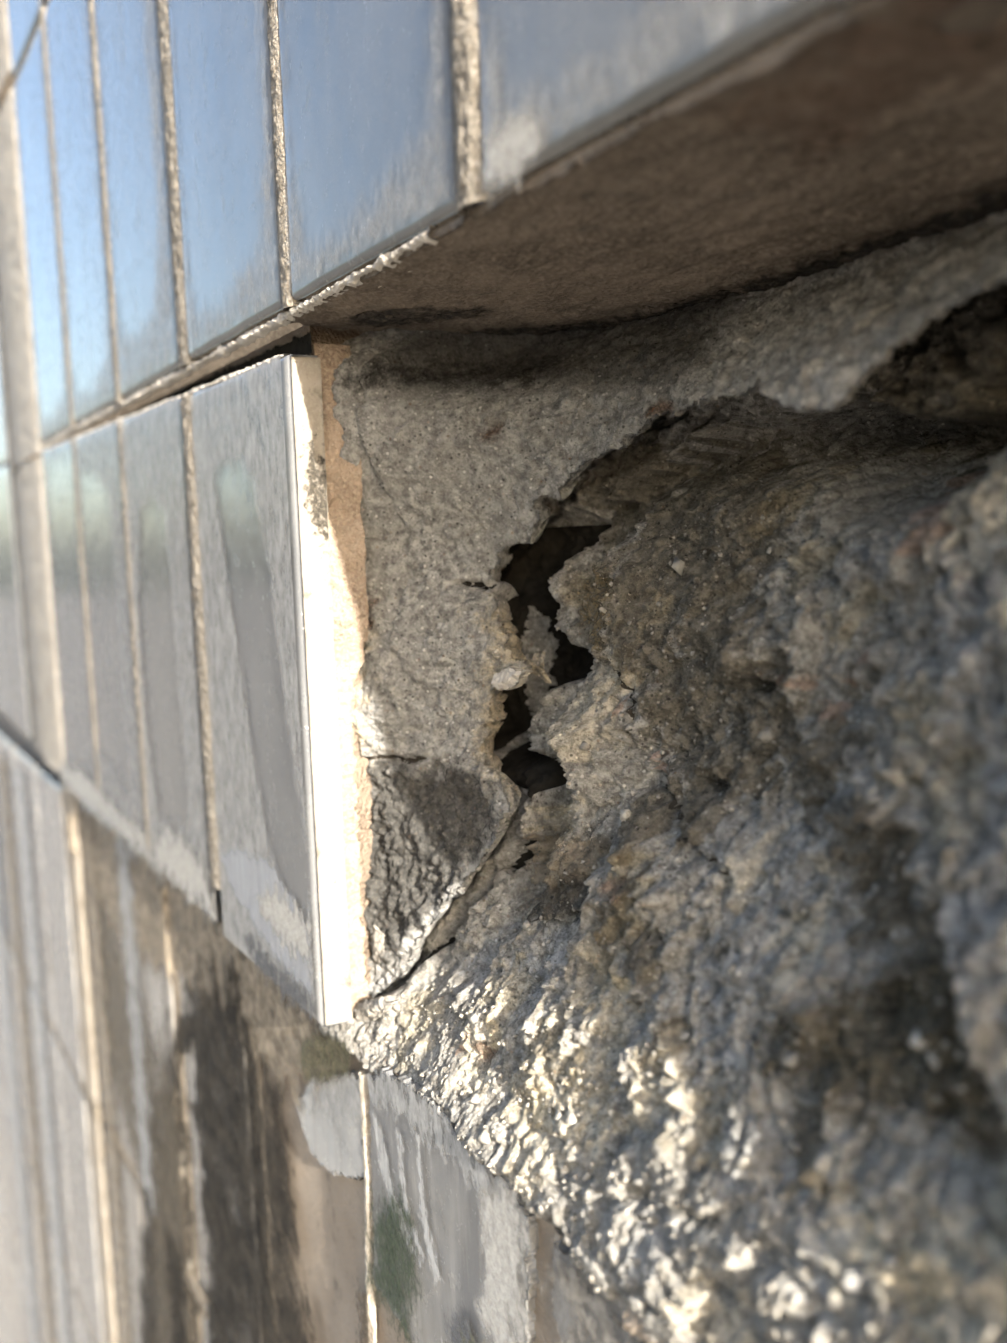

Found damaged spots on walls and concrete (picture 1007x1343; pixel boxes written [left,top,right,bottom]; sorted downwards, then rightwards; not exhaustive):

crack [462,524,637,799]
crack [366,755,426,764]
spalling [296,211,1007,1343]
crack [512,840,537,872]
crack [391,937,456,992]